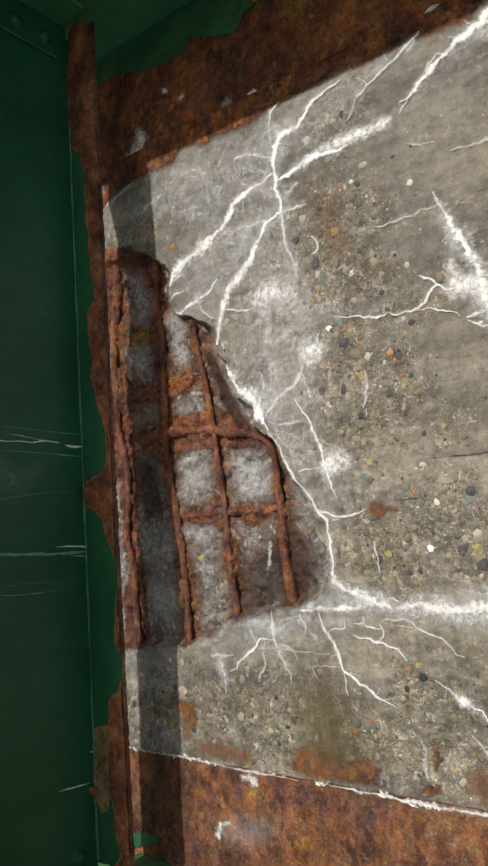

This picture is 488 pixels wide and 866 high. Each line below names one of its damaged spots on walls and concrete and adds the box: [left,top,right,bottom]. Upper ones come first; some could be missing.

crack [399,7,488,113]
crack [169,31,419,345]
spalling [302,104,344,168]
corrosion [66,0,481,652]
crack [336,191,488,326]
spalling [103,161,488,656]
crack [219,365,488,708]
corrosion [88,684,140,866]
leakage [236,769,296,785]
spalling [127,653,446,782]
corrosion [293,744,379,784]
leakage [314,780,488,817]